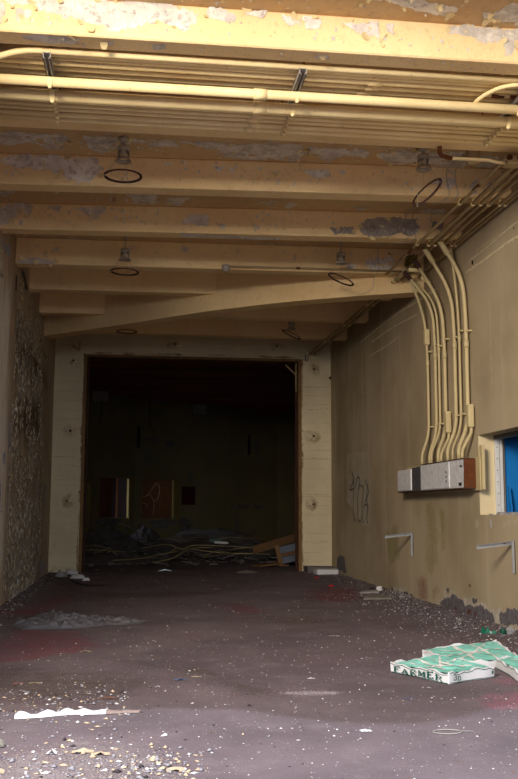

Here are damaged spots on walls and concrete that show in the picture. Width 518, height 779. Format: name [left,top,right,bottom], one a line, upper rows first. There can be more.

peeling [0,0,329,60]
peeling [330,18,411,48]
peeling [358,0,518,57]
peeling [0,130,504,195]
peeling [0,190,191,247]
peeling [329,201,453,275]